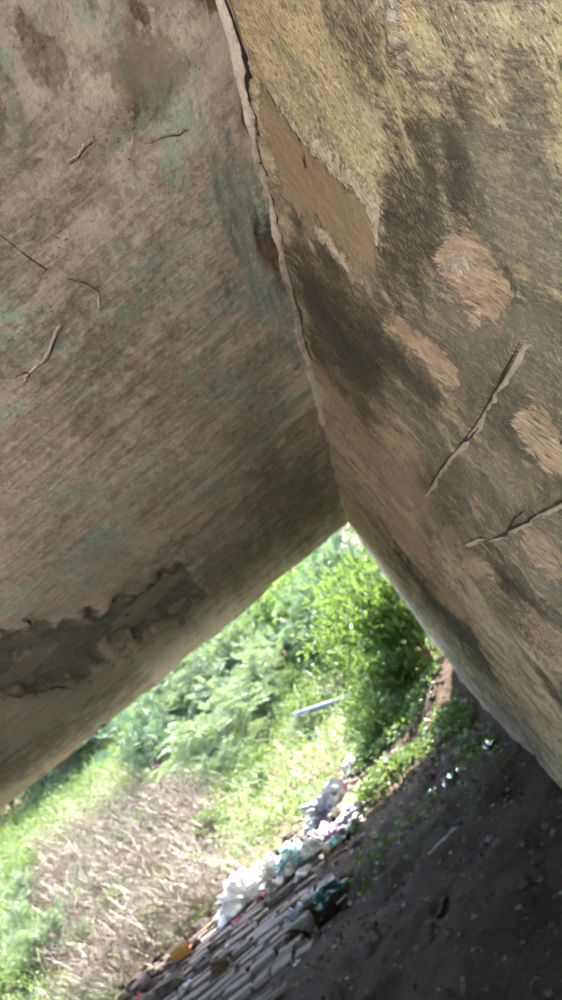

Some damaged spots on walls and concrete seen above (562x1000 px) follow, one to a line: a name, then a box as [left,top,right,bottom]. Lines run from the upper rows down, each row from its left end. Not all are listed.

water stain [323,0,402,96]
flaking render [254,214,280,271]
crack [224,0,314,362]
flaking render [259,82,383,289]
flaking render [431,214,514,331]
water stain [282,82,562,707]
crack [423,342,532,497]
flaking render [511,395,562,480]
crack [463,500,562,547]